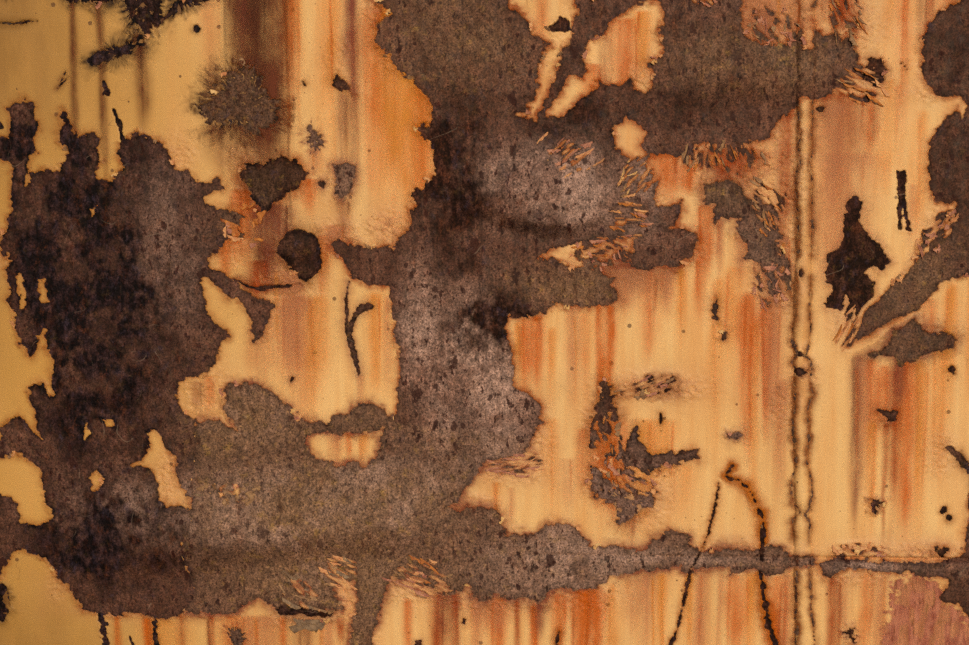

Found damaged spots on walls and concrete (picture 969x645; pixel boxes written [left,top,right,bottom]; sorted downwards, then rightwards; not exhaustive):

corrosion [66,0,209,97]
peeling [220,203,266,250]
corrosion [190,0,324,296]
peeling [537,132,605,179]
peeling [609,159,654,227]
corrosion [824,0,969,506]
corrosion [785,273,813,377]
corrosion [585,356,700,525]
corrosion [789,375,817,540]
peeling [278,569,328,634]
crack [669,461,782,645]
peeling [882,574,969,645]